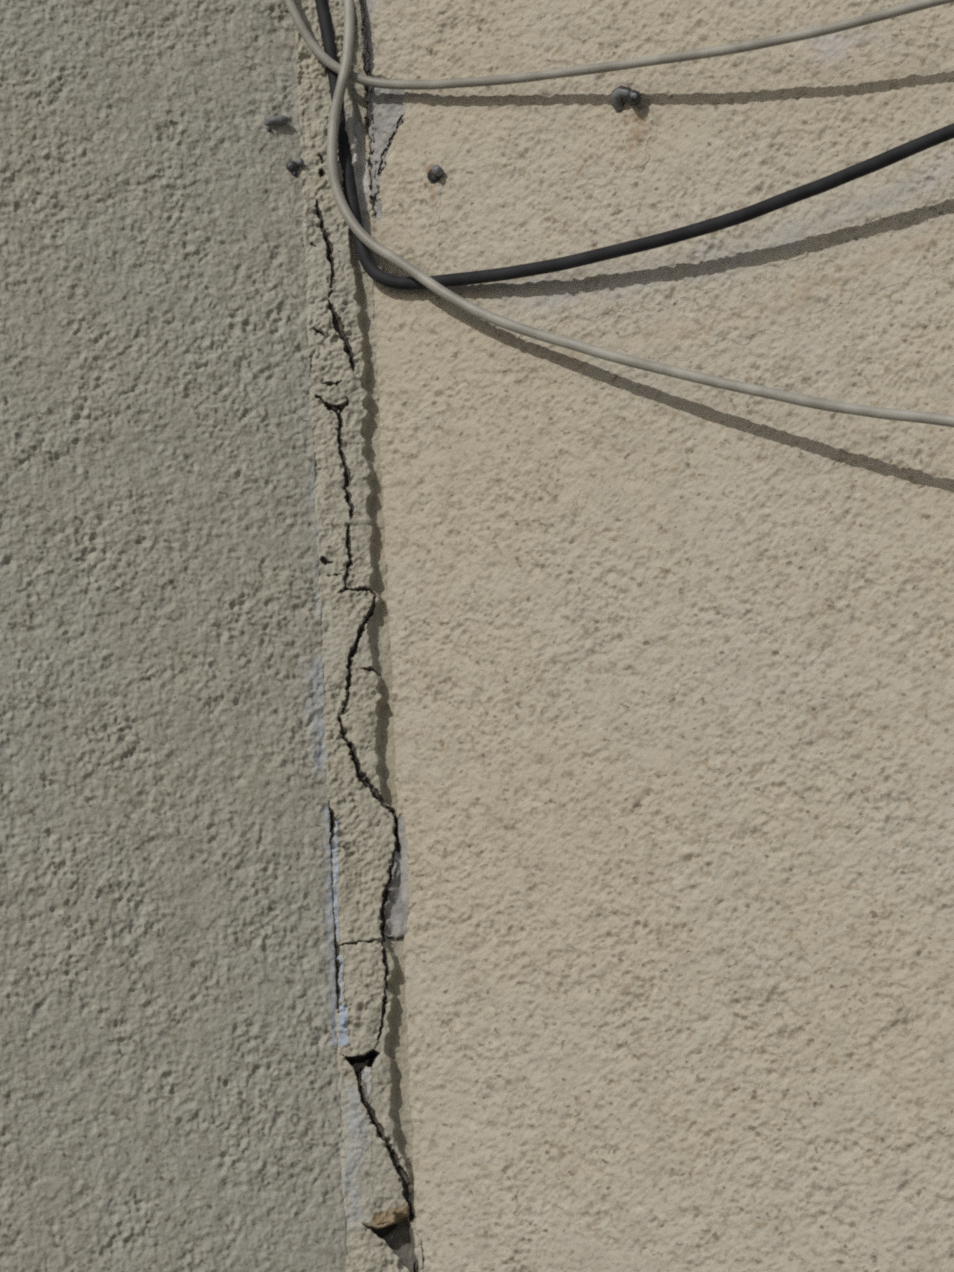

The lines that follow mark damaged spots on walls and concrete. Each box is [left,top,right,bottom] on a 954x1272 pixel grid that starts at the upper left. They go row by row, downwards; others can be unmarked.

flaking render [345,0,406,235]
crack [309,153,400,1040]
peeling [321,801,417,1272]
crack [342,1055,414,1220]